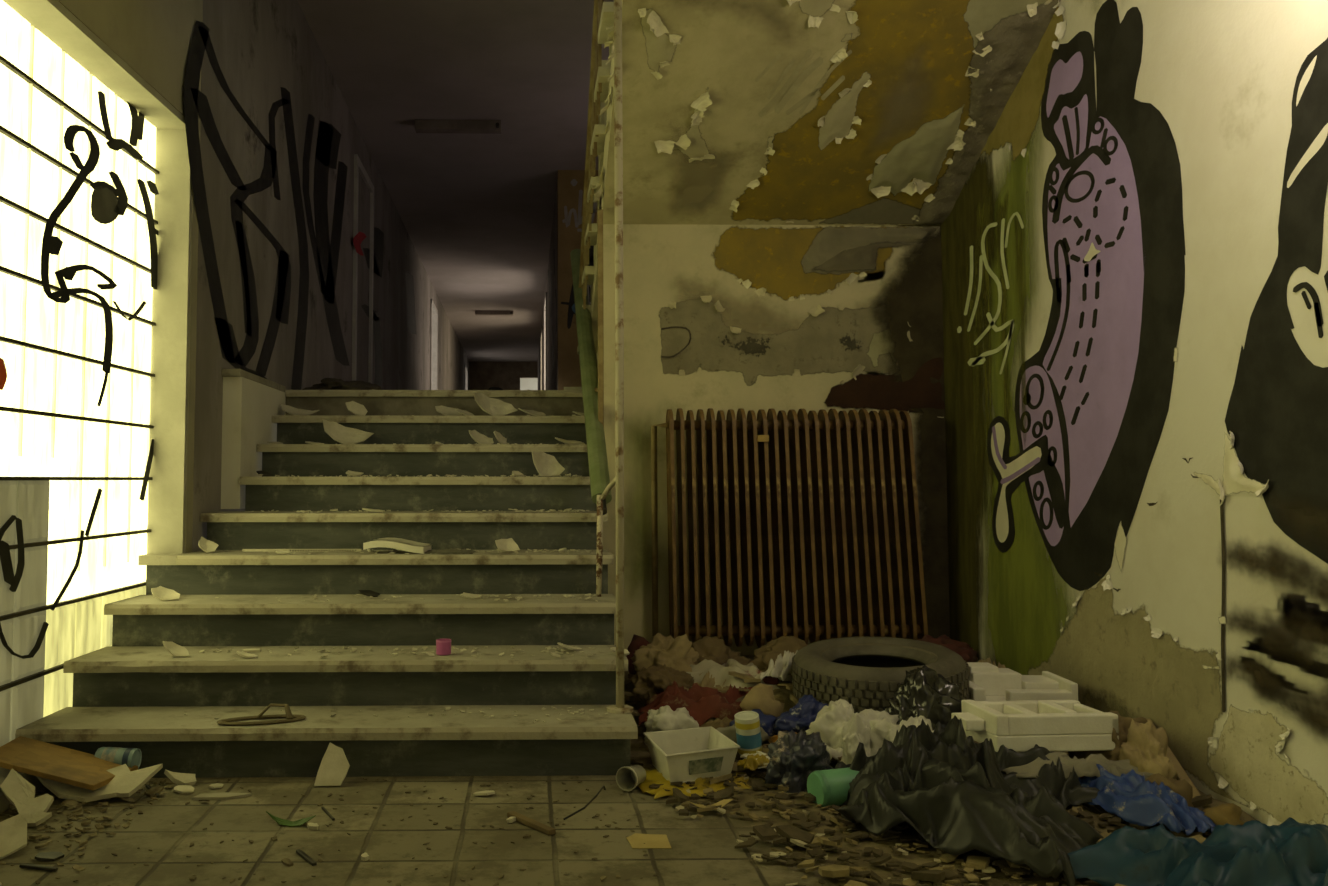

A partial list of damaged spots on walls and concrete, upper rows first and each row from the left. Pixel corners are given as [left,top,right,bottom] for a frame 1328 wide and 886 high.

peeling [638,8,682,80]
peeling [654,0,1066,418]
peeling [1194,432,1269,506]
flaking render [1028,524,1328,826]